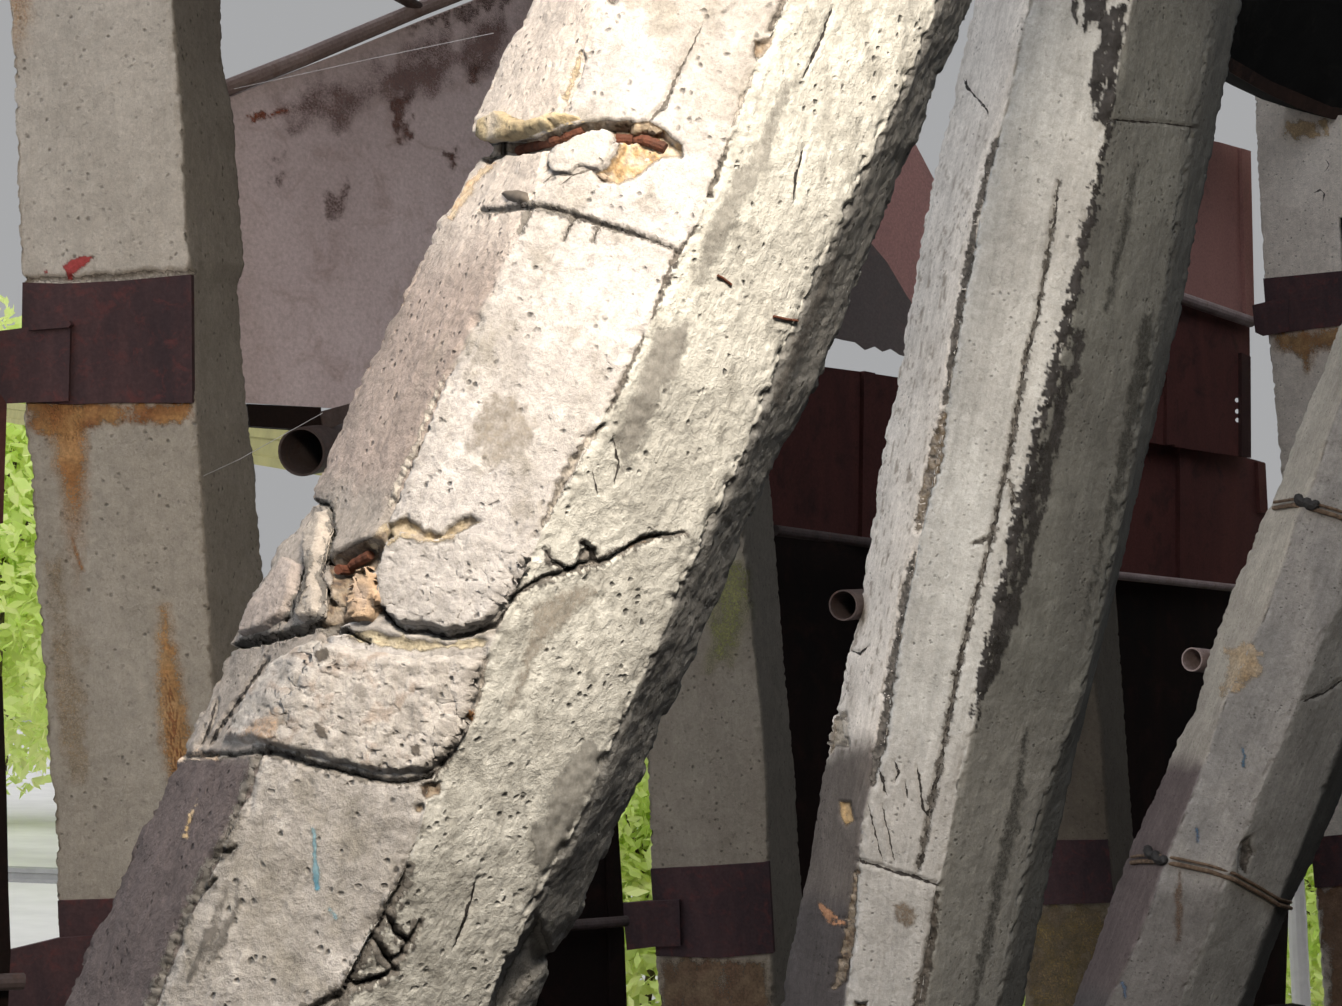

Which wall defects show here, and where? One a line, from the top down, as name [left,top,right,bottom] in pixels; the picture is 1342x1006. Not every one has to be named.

crack [477,169,677,251]
spalling [475,52,682,184]
leakage [1071,0,1107,33]
rust [26,402,192,521]
spalling [238,374,531,721]
crack [858,179,1062,886]
leakage [985,328,1085,689]
leakage [1089,314,1152,591]
rust [157,606,190,774]
crack [143,499,689,1006]
leakage [972,732,1027,1005]
crack [1303,680,1342,702]